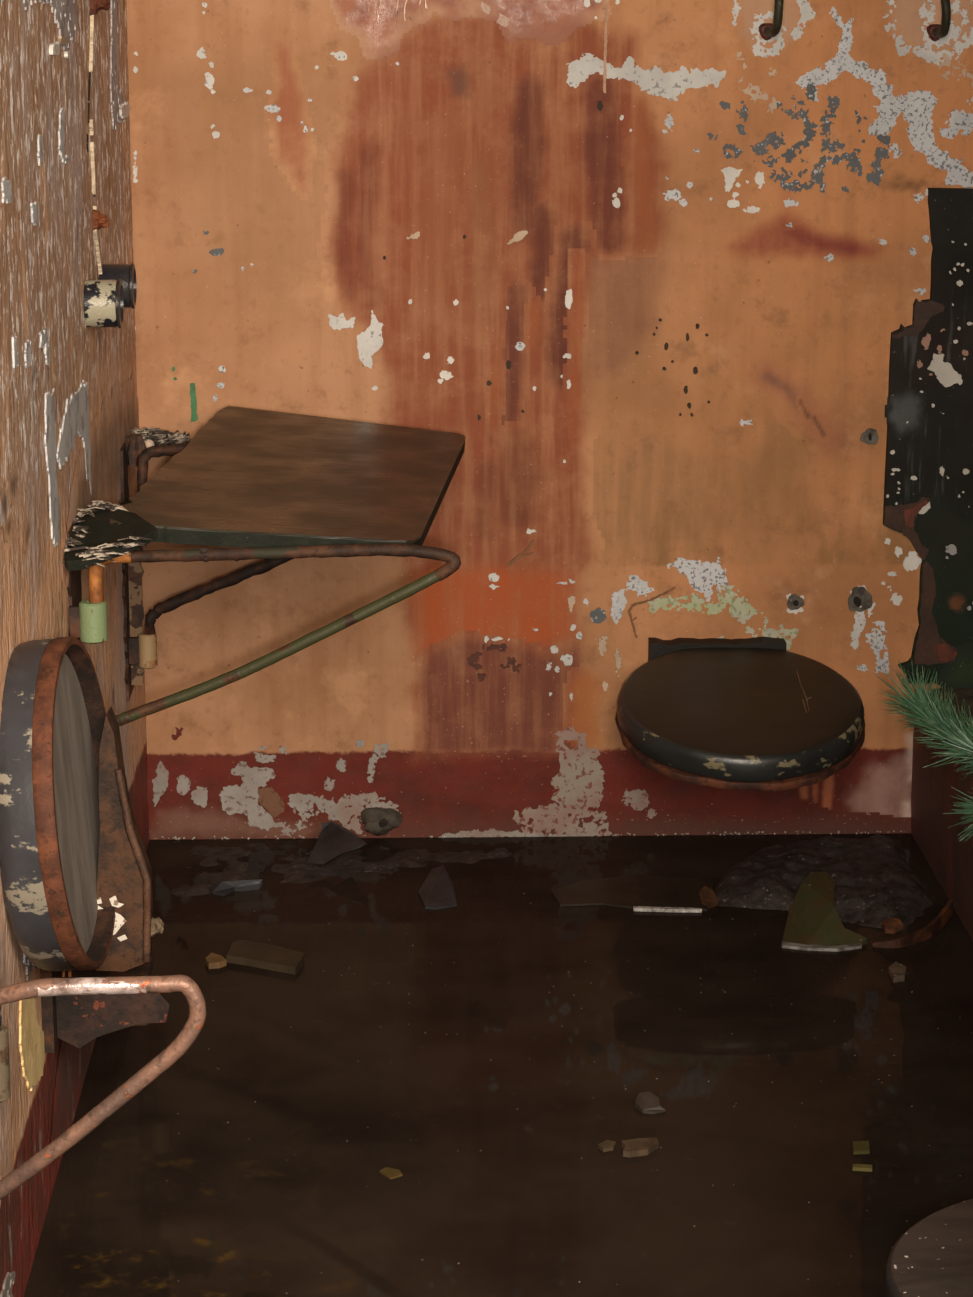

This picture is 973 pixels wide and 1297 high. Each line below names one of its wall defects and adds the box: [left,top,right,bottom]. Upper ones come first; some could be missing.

peeling [37,108,70,166]
corrosion [719,174,894,268]
peeling [12,327,50,368]
peeling [328,310,383,369]
peeling [437,356,454,384]
leakage [317,0,862,773]
peeling [892,288,973,414]
peeling [44,380,92,547]
peeling [546,645,573,673]
peeling [557,557,804,691]
peeling [152,740,401,836]
peeling [438,725,619,838]